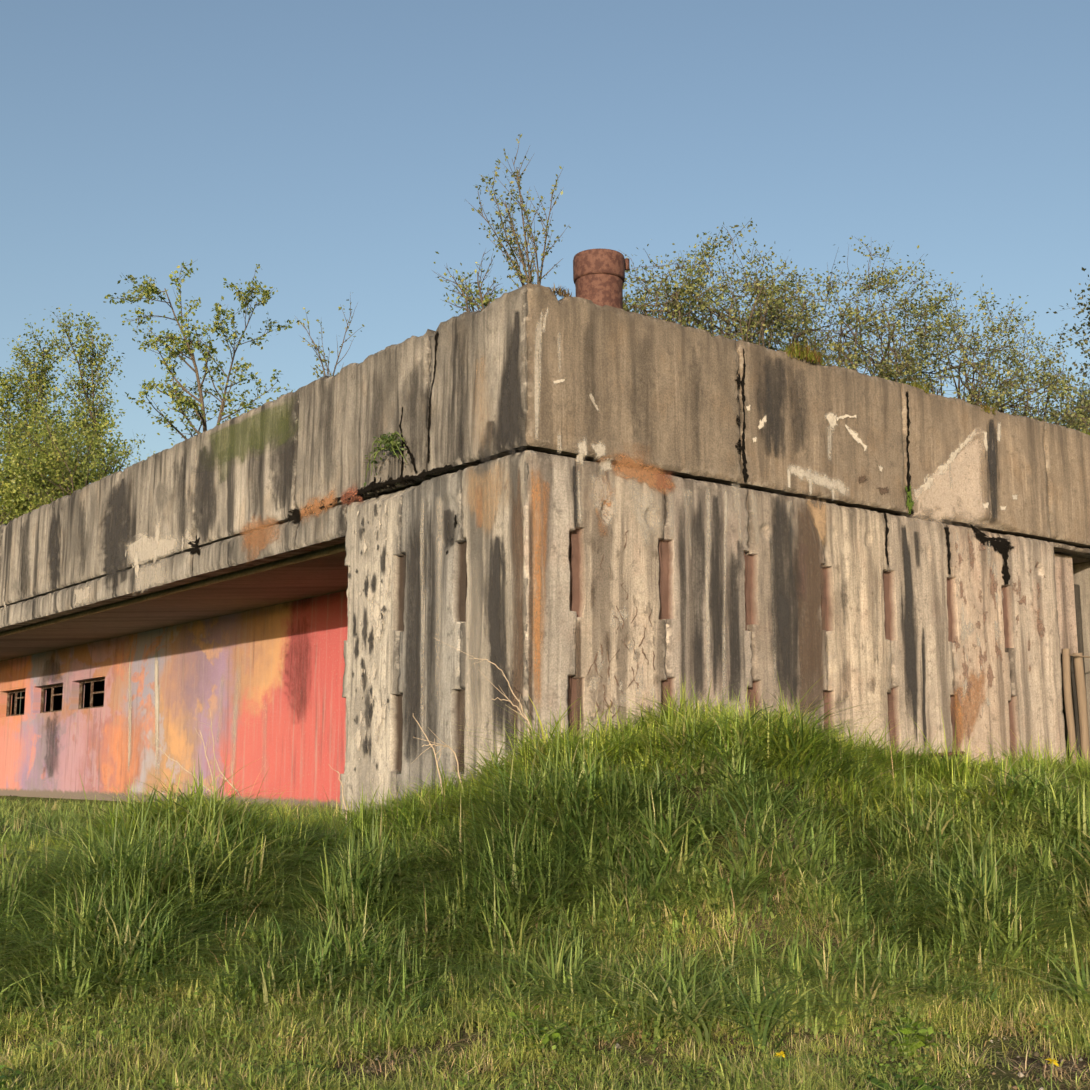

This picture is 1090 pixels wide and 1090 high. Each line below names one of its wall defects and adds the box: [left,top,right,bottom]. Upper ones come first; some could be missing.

damp [48,513,61,592]
damp [74,587,90,606]
damp [101,444,216,589]
damp [270,413,293,508]
corrosion [301,488,362,518]
crack [305,332,453,510]
corrosion [528,479,548,740]
corrosion [595,454,674,512]
crack [735,348,749,483]
damp [758,359,803,457]
crack [884,392,914,565]
crack [943,527,951,574]